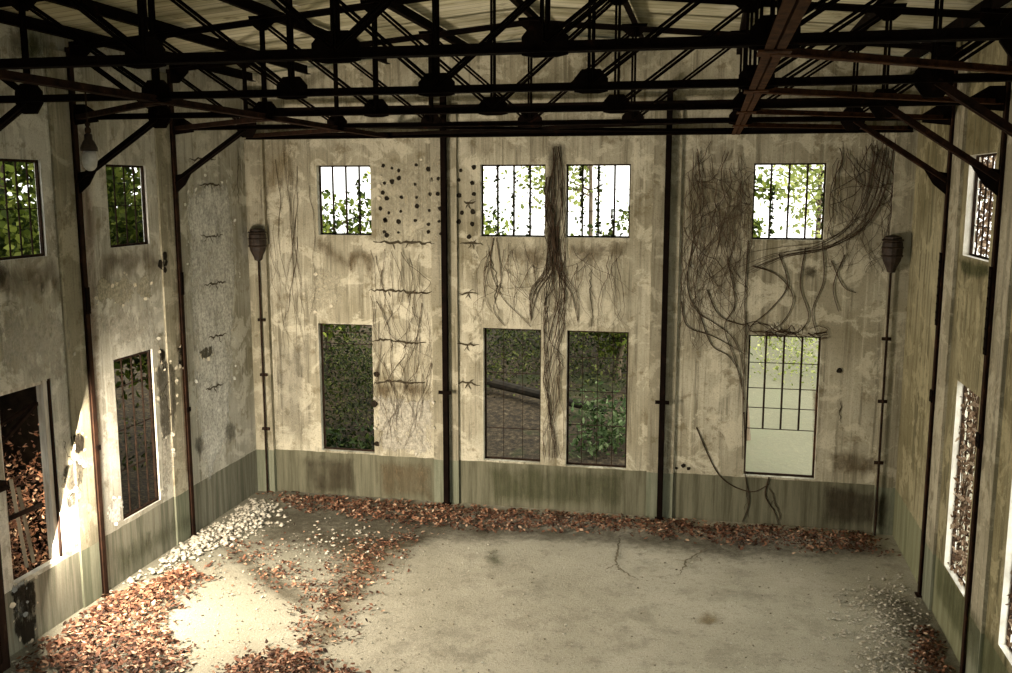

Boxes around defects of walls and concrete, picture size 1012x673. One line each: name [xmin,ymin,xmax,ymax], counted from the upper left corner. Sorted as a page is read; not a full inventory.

peeling [184,174,241,477]
flaking render [61,431,87,510]
flaking render [155,337,184,494]
flaking render [10,575,38,645]